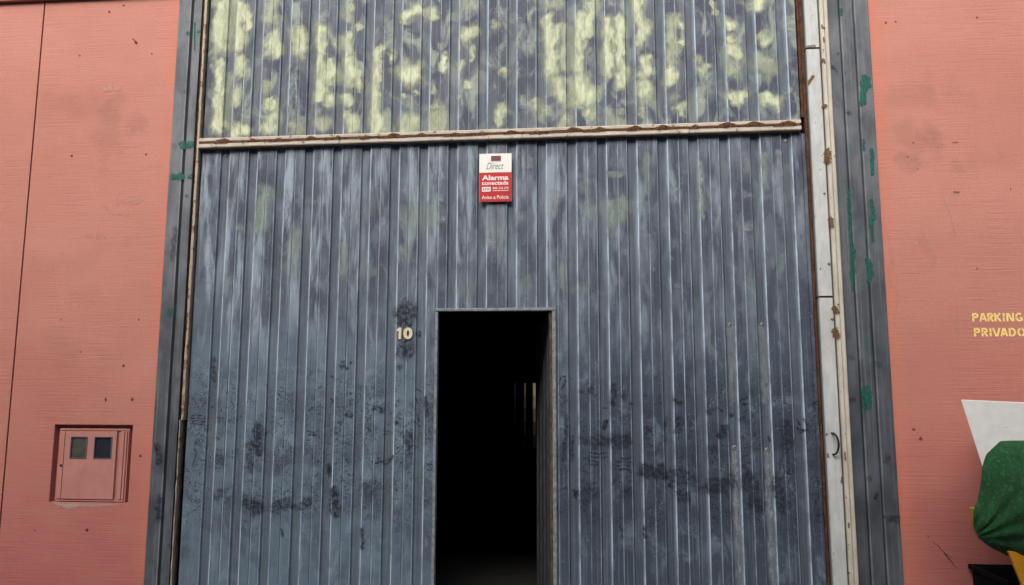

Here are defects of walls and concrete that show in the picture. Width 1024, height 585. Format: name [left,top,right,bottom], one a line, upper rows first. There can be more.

rust [193,0,830,585]
rust [830,304,840,339]